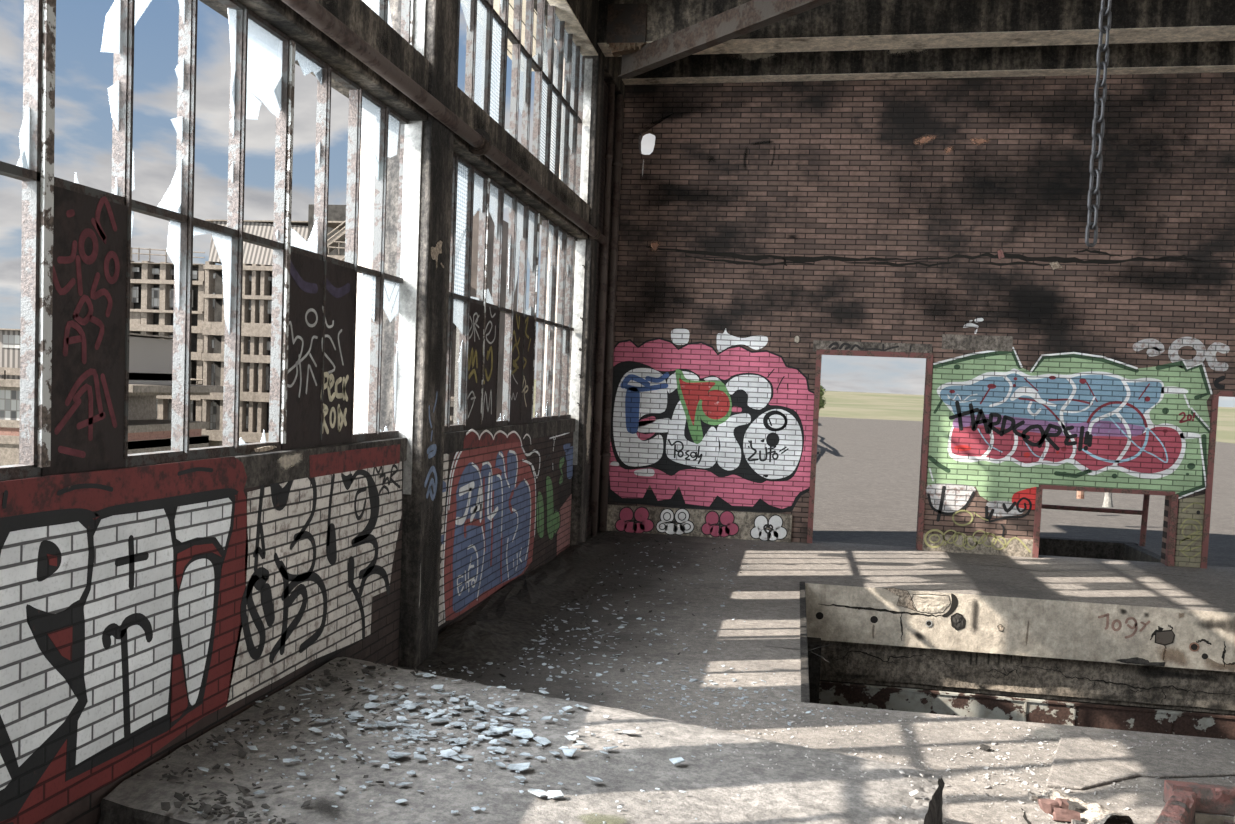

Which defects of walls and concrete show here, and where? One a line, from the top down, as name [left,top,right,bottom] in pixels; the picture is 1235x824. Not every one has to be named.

crack [646,246,1235,267]